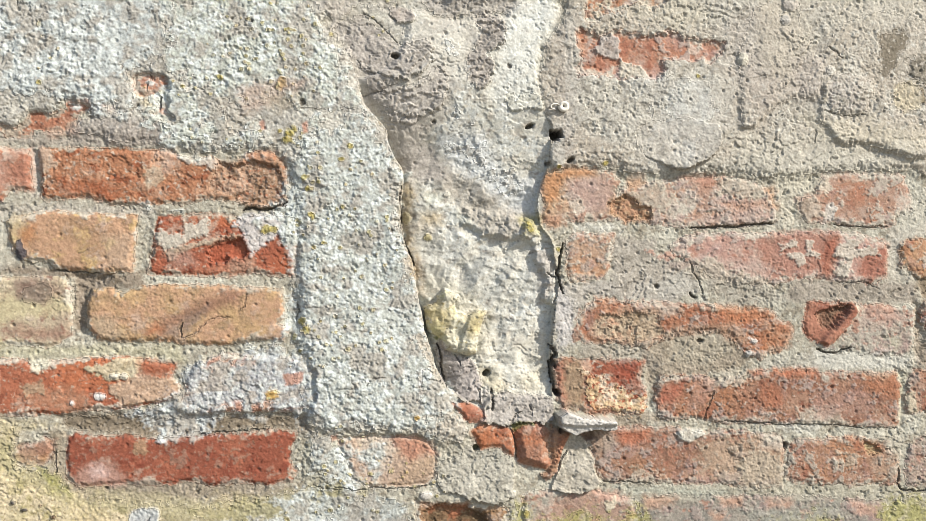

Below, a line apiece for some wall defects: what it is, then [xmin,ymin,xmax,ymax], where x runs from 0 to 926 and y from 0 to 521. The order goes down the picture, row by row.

spalling [209,160,287,207]
spalling [208,238,247,264]
crack [399,187,415,269]
crack [547,245,564,293]
spalling [607,195,653,224]
spalling [596,312,674,344]
spalling [815,305,851,330]
crack [547,345,558,389]
spalling [0,422,248,521]
peeling [422,443,516,521]
peeling [552,435,602,494]
spalling [863,442,881,454]